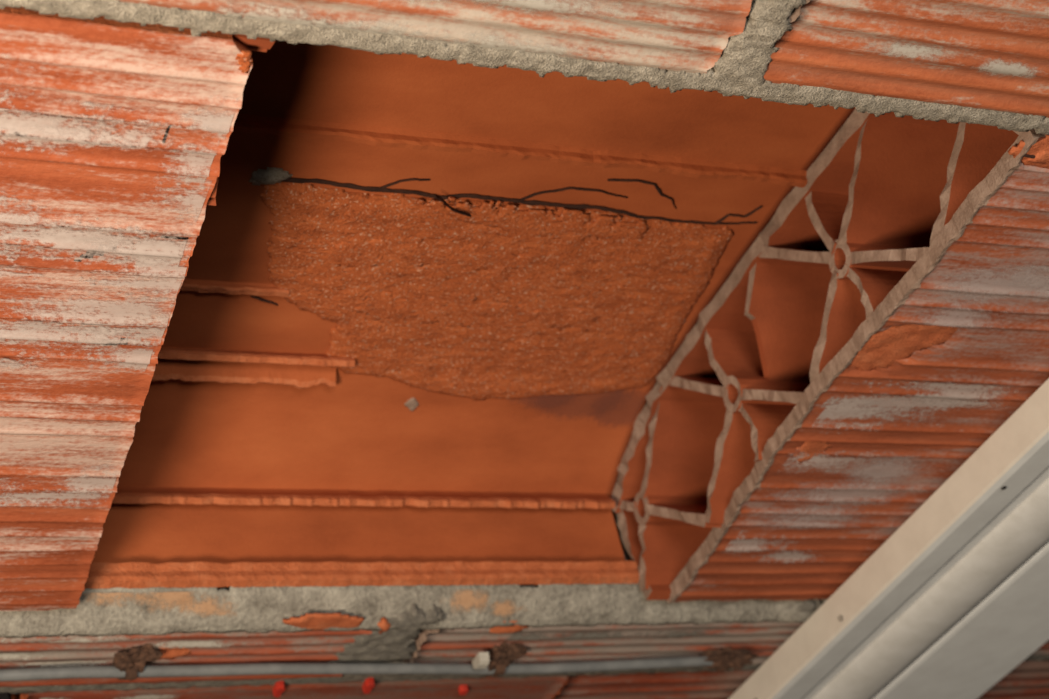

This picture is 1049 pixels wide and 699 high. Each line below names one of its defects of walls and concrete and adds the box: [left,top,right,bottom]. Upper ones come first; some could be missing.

peeling [235,49,253,73]
crack [281,178,762,225]
spalling [249,167,734,411]
peeling [850,324,958,371]
peeling [793,441,832,463]
spalling [0,561,828,660]